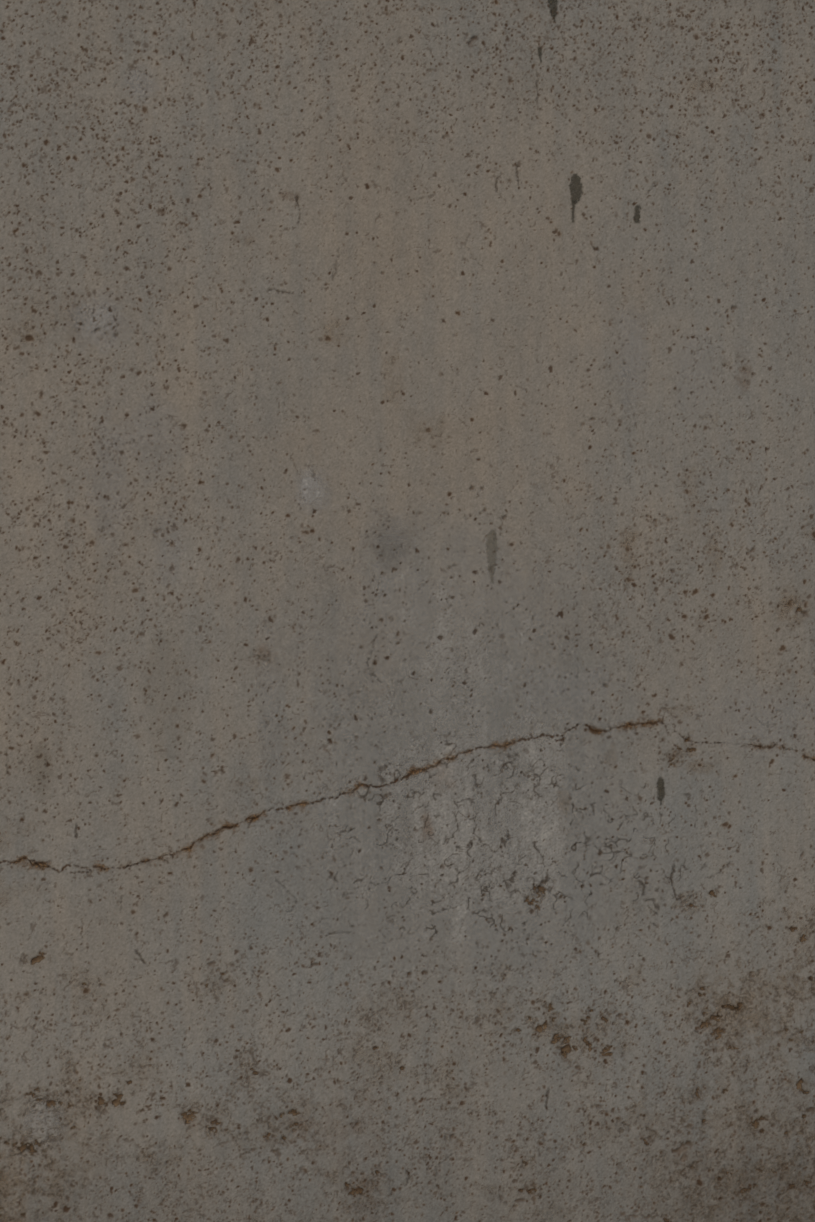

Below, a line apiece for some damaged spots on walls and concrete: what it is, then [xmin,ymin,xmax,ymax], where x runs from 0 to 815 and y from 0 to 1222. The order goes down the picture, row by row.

water stain [548,0,558,21]
water stain [569,174,582,222]
crack [0,720,720,924]